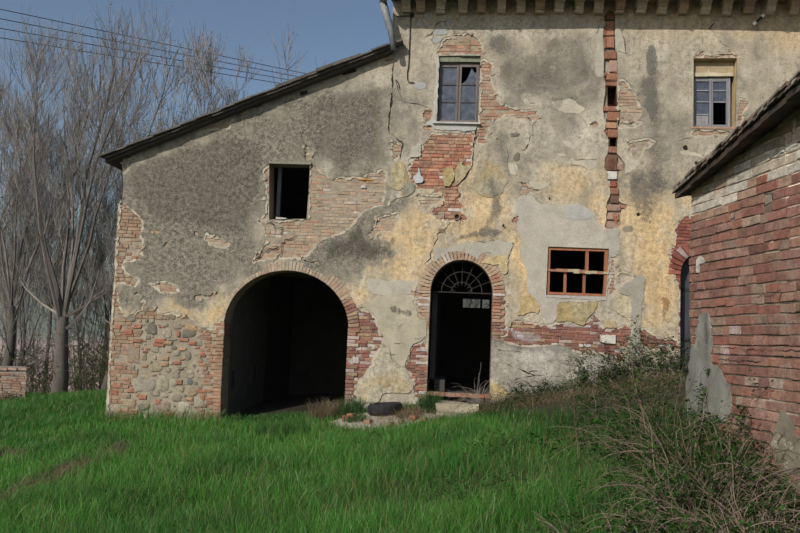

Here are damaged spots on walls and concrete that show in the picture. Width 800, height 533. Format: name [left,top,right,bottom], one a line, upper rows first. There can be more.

crack [385,62,429,157]
flaking render [389,32,542,224]
flaking render [616,78,643,129]
damp [641,45,659,121]
flaking render [690,97,749,139]
flaking render [194,229,230,249]
crack [247,221,292,267]
flaking render [251,146,399,264]
flaking render [105,200,224,422]
flaking render [342,299,386,399]
flaking render [411,108,800,497]